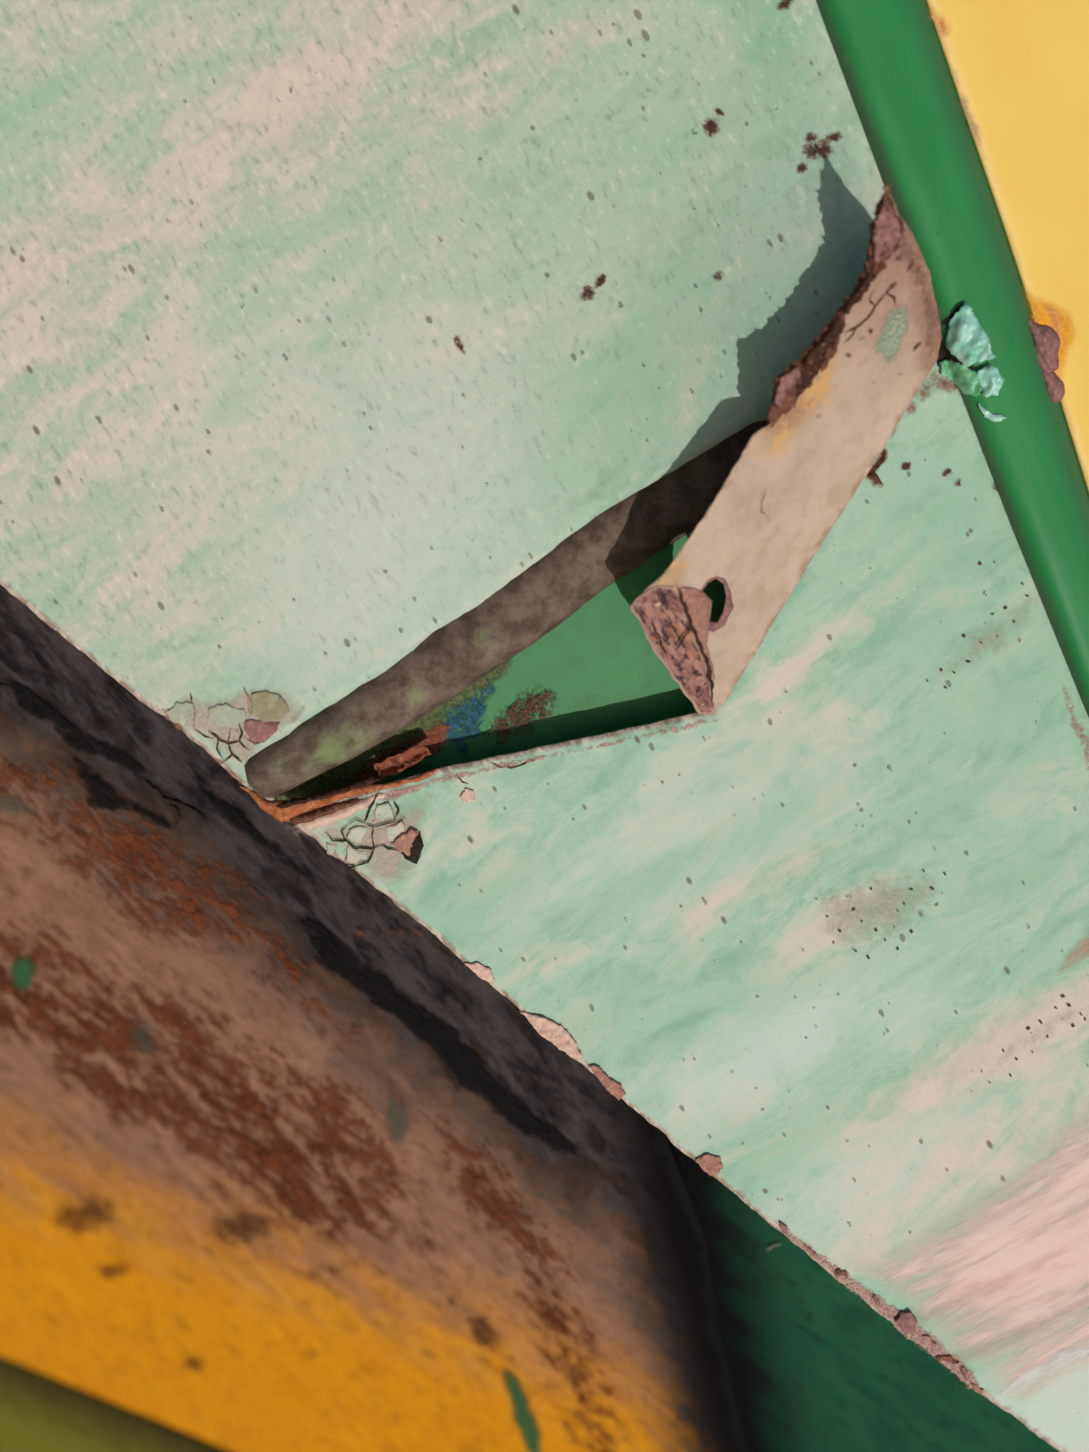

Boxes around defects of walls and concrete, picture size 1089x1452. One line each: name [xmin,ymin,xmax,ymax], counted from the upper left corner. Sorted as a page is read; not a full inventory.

peeling [775,201,901,409]
corrosion [1028,299,1073,403]
peeling [4,680,171,829]
peeling [166,691,291,759]
corrosion [1067,692,1089,768]
peeling [198,780,311,878]
peeling [276,746,432,877]
corrosion [0,921,438,1257]
peeling [300,917,578,1155]
peeling [519,1010,626,1100]
peeling [695,1153,723,1176]
peeling [895,1312,918,1335]